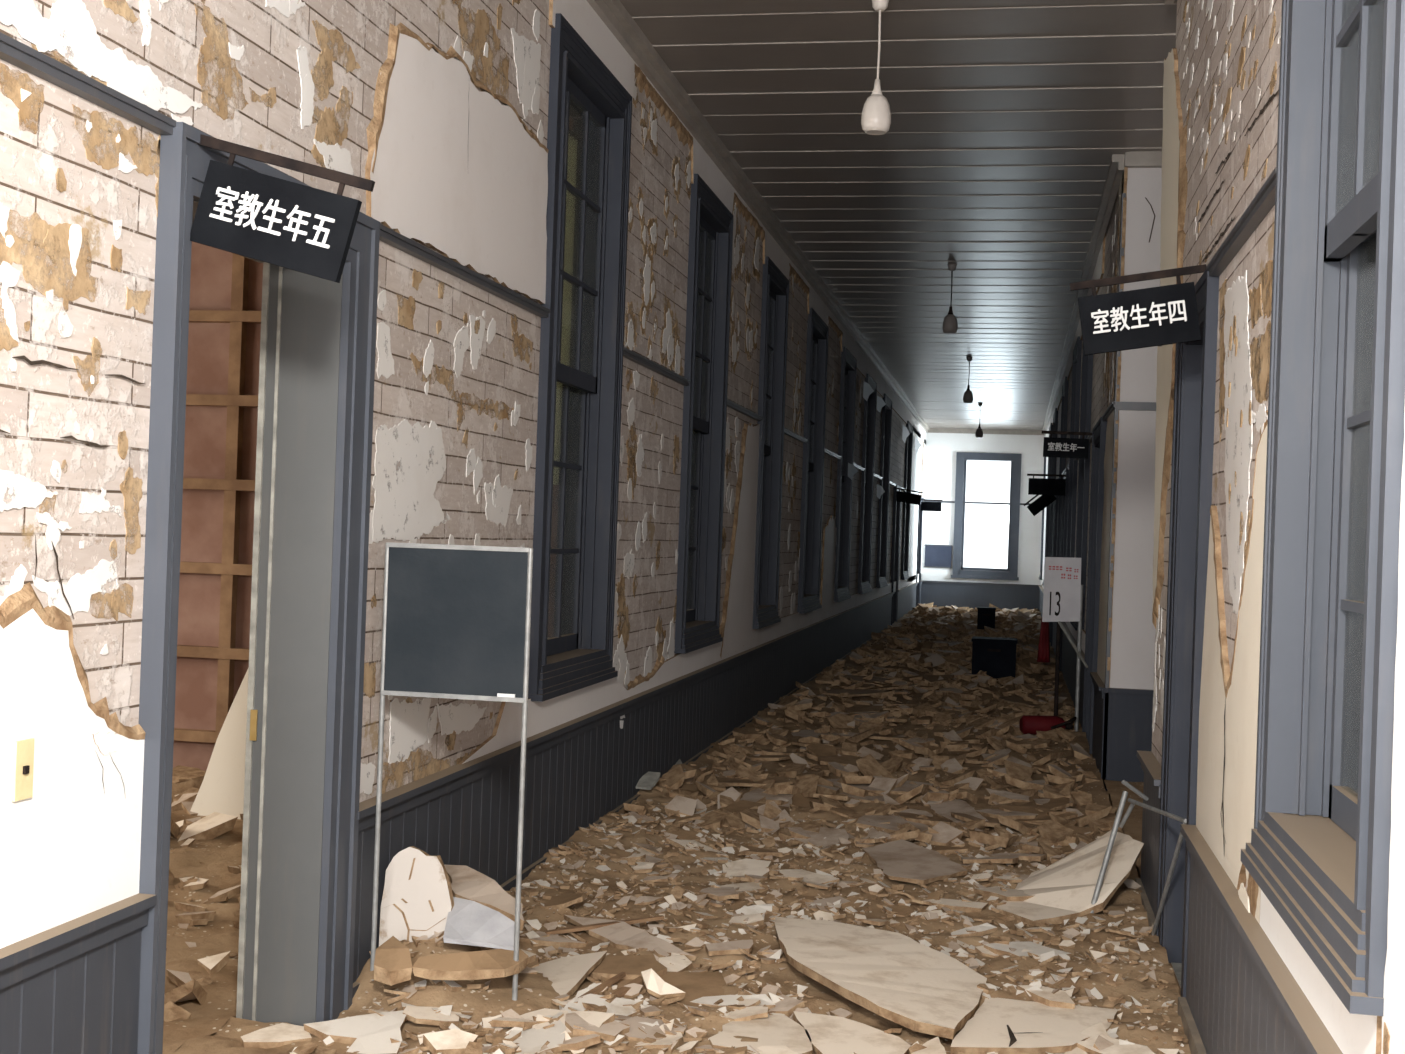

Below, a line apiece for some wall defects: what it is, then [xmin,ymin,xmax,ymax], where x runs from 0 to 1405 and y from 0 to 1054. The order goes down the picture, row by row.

flaking render [0,0,551,803]
flaking render [613,63,693,690]
flaking render [1176,0,1282,698]
flaking render [1238,873,1259,917]